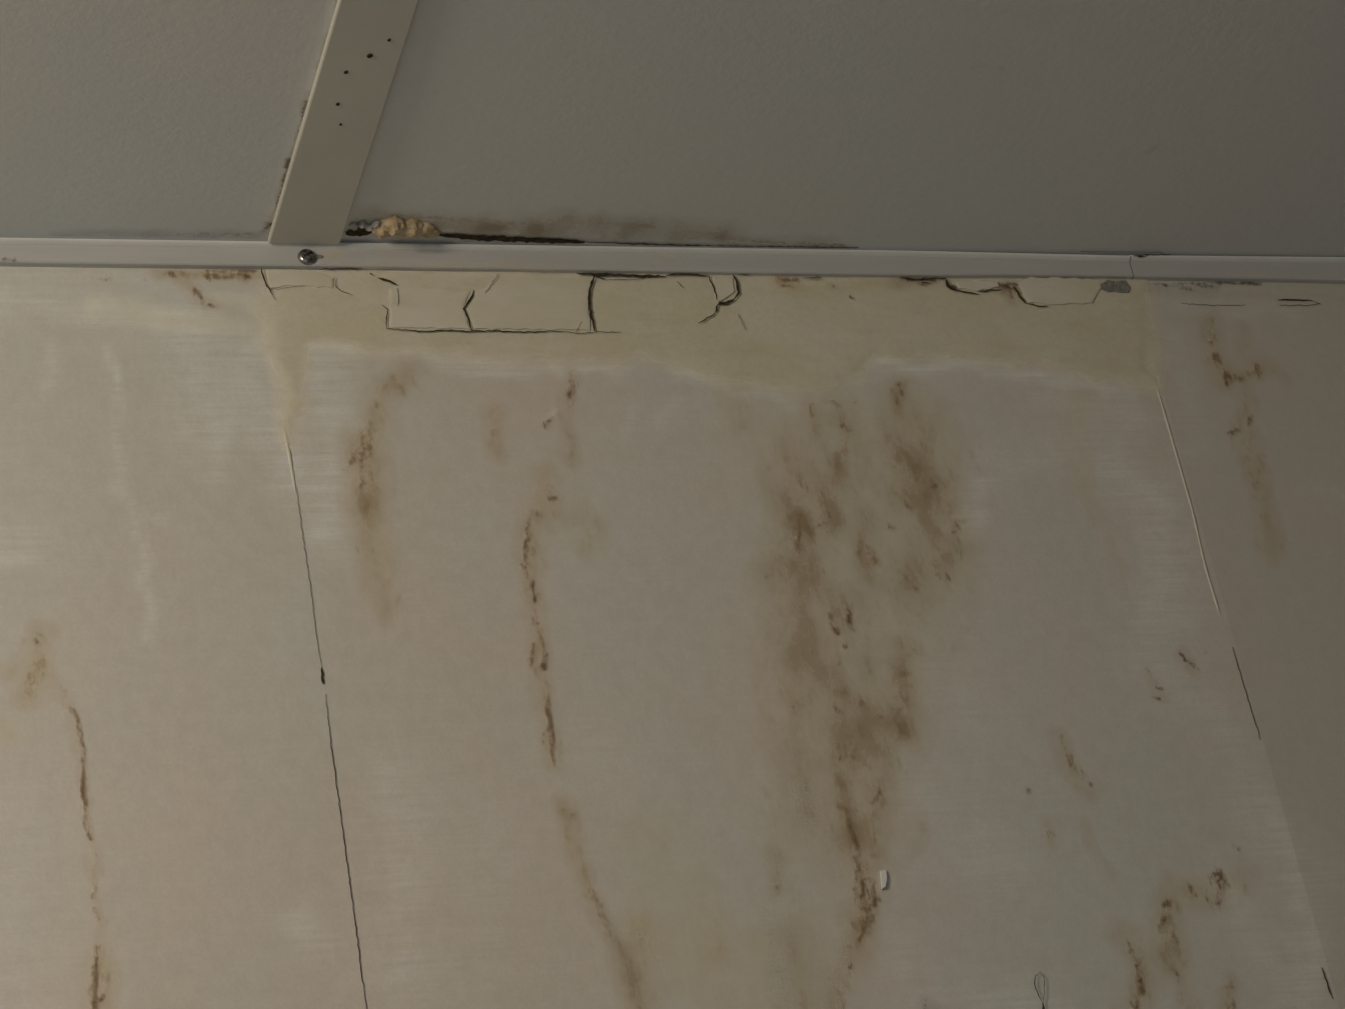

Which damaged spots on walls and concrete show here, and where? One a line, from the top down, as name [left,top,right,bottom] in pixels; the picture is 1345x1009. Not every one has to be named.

crack [346,228,372,236]
crack [261,234,859,334]
crack [901,277,1048,307]
corrosion [542,700,555,761]
corrosion [786,499,913,947]
corrosion [73,710,91,840]
corrosion [91,957,103,1009]